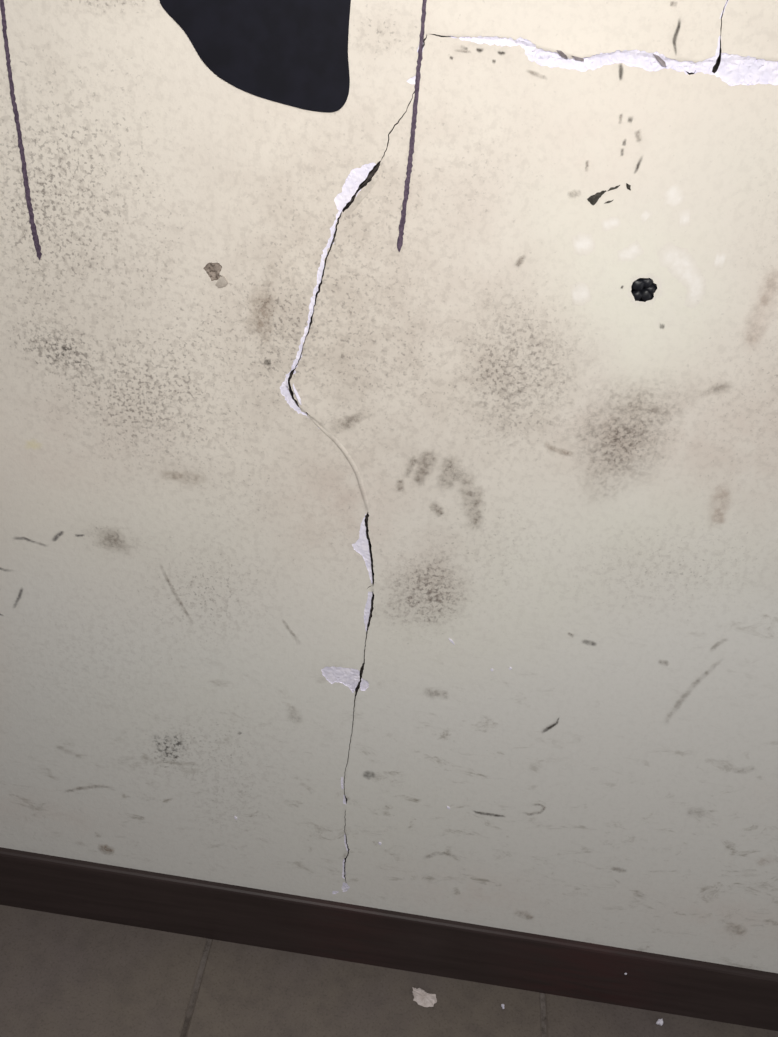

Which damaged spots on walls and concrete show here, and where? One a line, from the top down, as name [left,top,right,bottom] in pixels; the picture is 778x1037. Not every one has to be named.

peeling [431,34,778,86]
crack [708,0,729,75]
spalling [334,163,376,212]
crack [280,91,415,894]
spalling [352,514,372,583]
spalling [321,666,369,693]